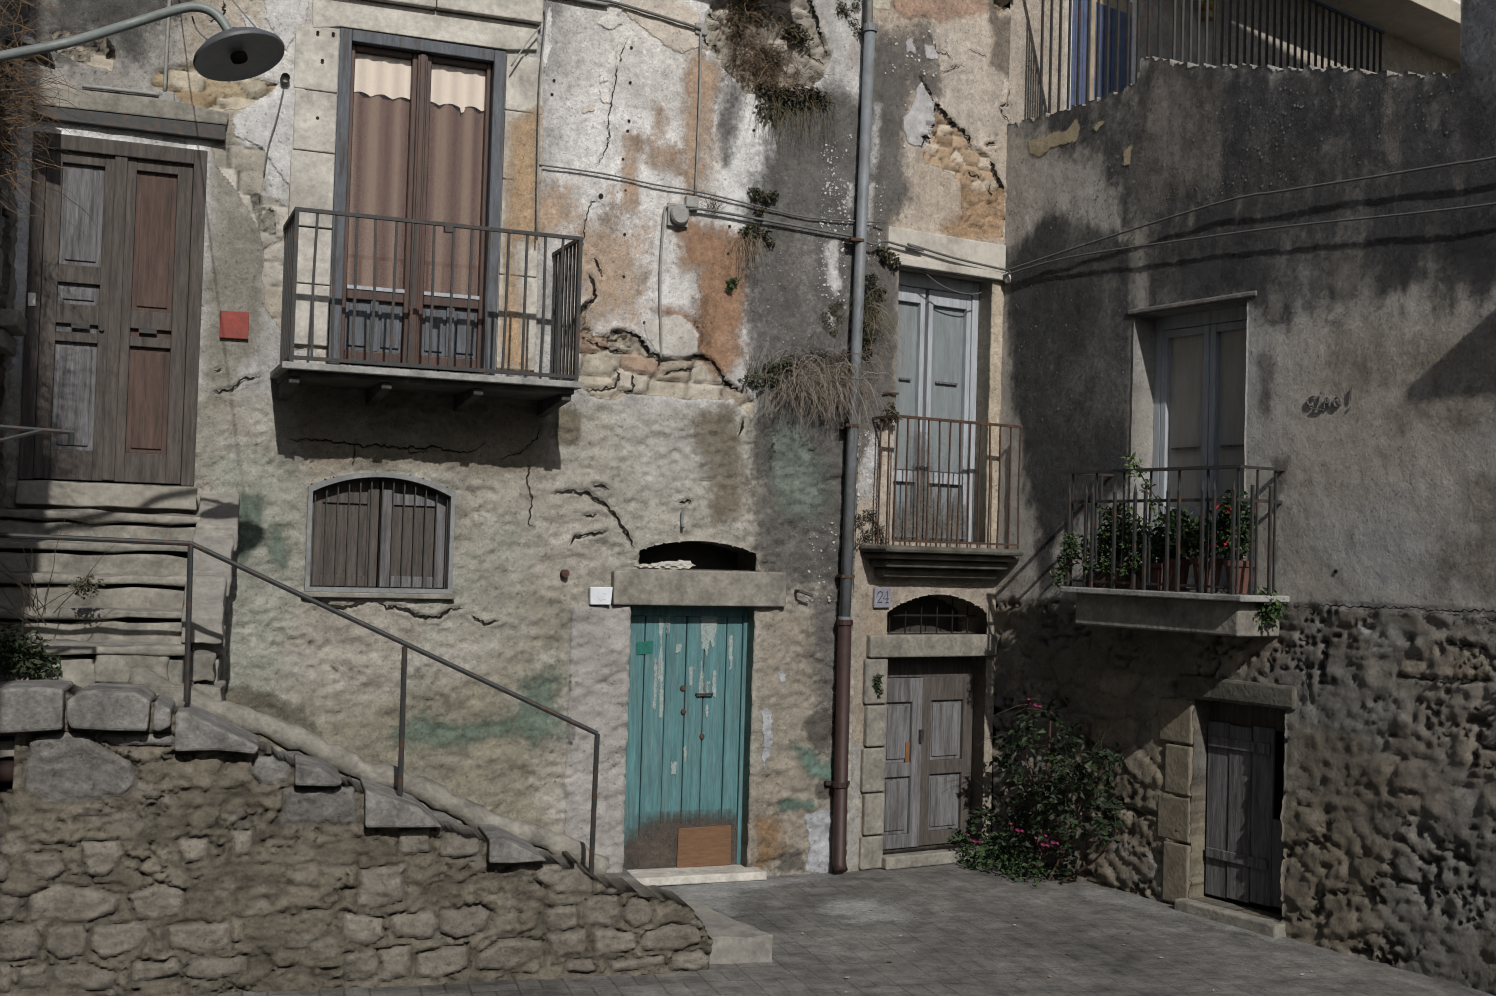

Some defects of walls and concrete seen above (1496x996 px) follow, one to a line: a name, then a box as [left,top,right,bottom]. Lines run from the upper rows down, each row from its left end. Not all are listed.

peeling [242,0,309,49]
spalling [598,0,832,94]
peeling [906,38,938,59]
peeling [151,64,329,330]
spalling [903,82,1005,238]
damp [1005,0,1496,597]
damp [554,407,580,445]
spalling [554,302,754,418]
damp [694,25,949,761]
crack [289,423,636,549]
damp [778,852,803,871]